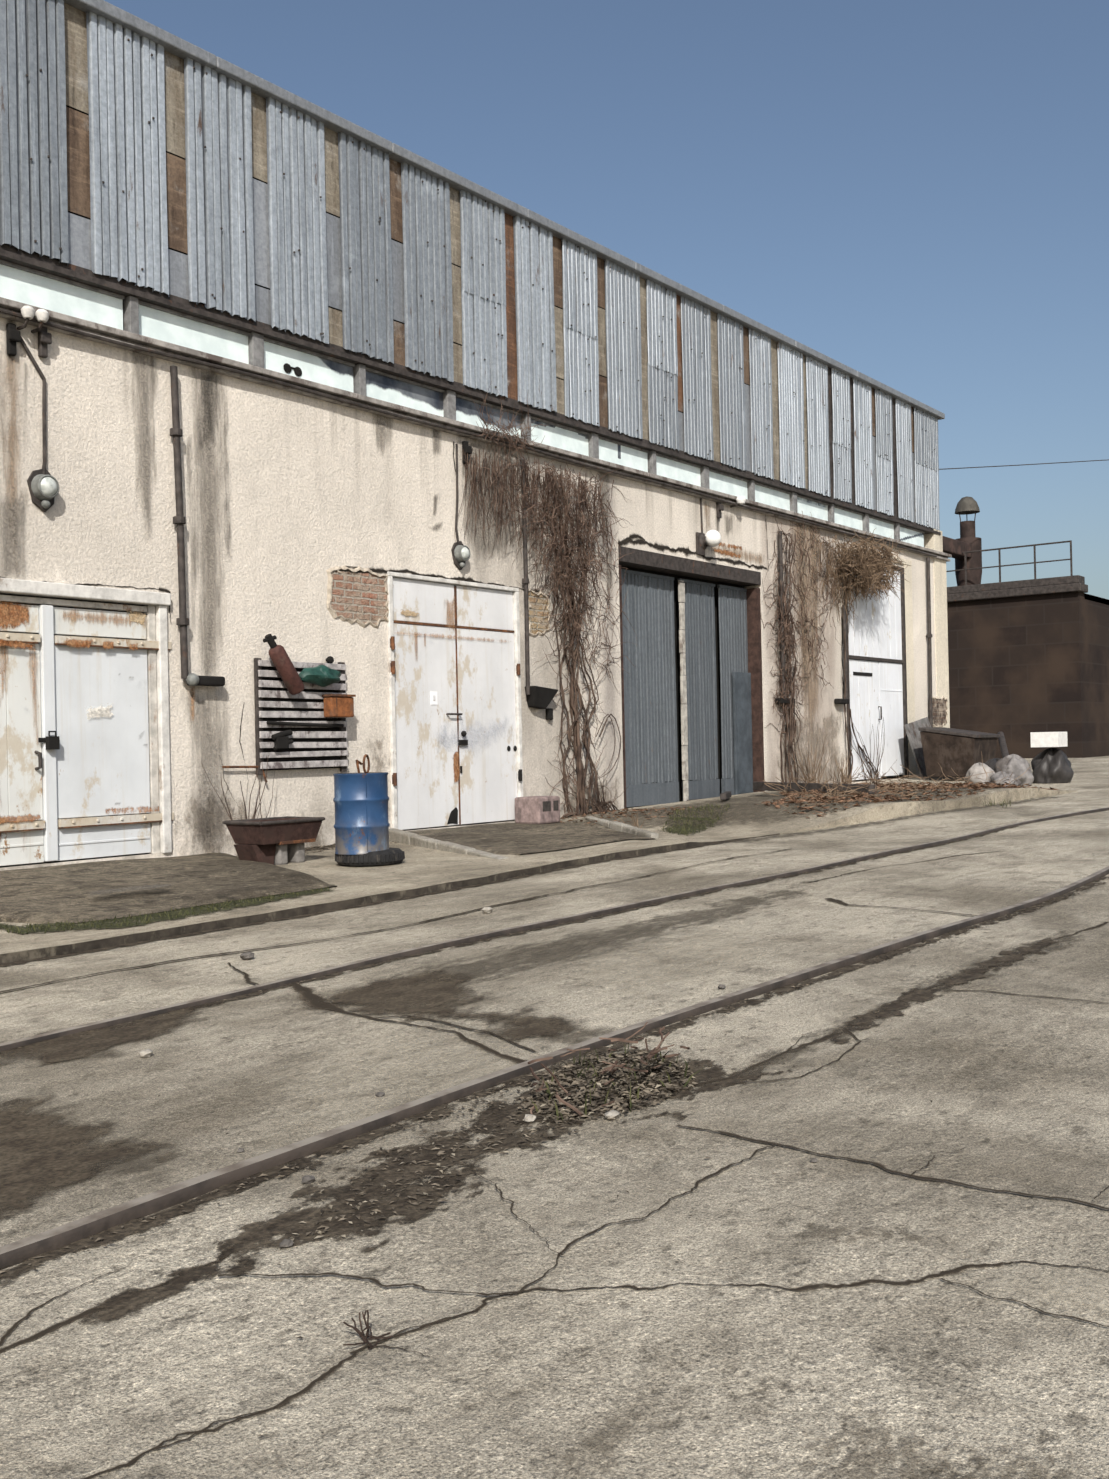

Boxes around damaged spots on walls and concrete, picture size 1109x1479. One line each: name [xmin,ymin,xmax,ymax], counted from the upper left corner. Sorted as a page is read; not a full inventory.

water stain [1,355,24,574]
rust [0,601,170,712]
rust [0,803,173,837]
water stain [136,353,154,519]
water stain [188,373,230,676]
water stain [196,699,222,850]
flaking render [326,565,389,629]
rust [394,586,514,824]
water stain [0,1095,173,1220]
crack [0,1125,1109,1479]